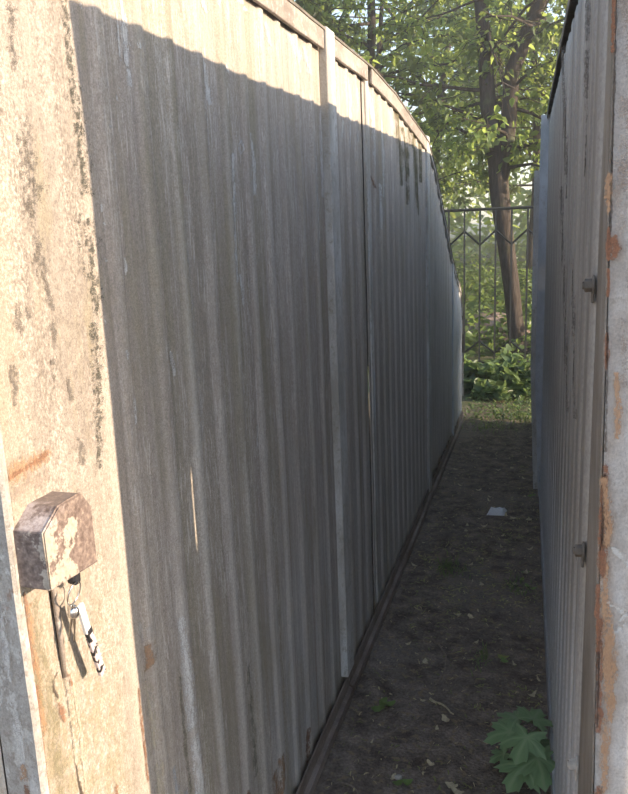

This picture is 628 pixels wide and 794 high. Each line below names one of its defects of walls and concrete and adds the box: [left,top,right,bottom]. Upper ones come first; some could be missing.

water stain [16,116,48,277]
water stain [394,111,422,215]
corrosion [7,450,53,500]
corrosion [600,476,614,549]
corrosion [594,559,618,794]